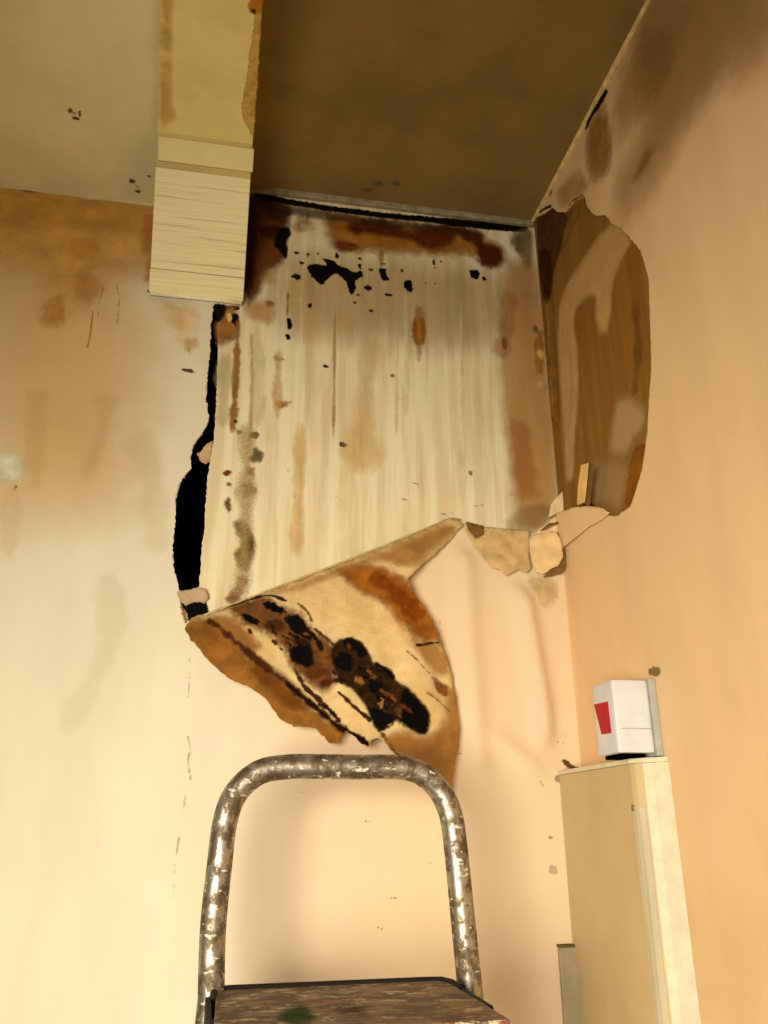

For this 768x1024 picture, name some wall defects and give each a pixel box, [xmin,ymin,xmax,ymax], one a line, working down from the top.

leakage [0,179,154,471]
leakage [274,227,392,303]
leakage [323,318,347,447]
peeling [190,196,651,612]
leakage [502,207,580,526]
leakage [588,114,610,175]